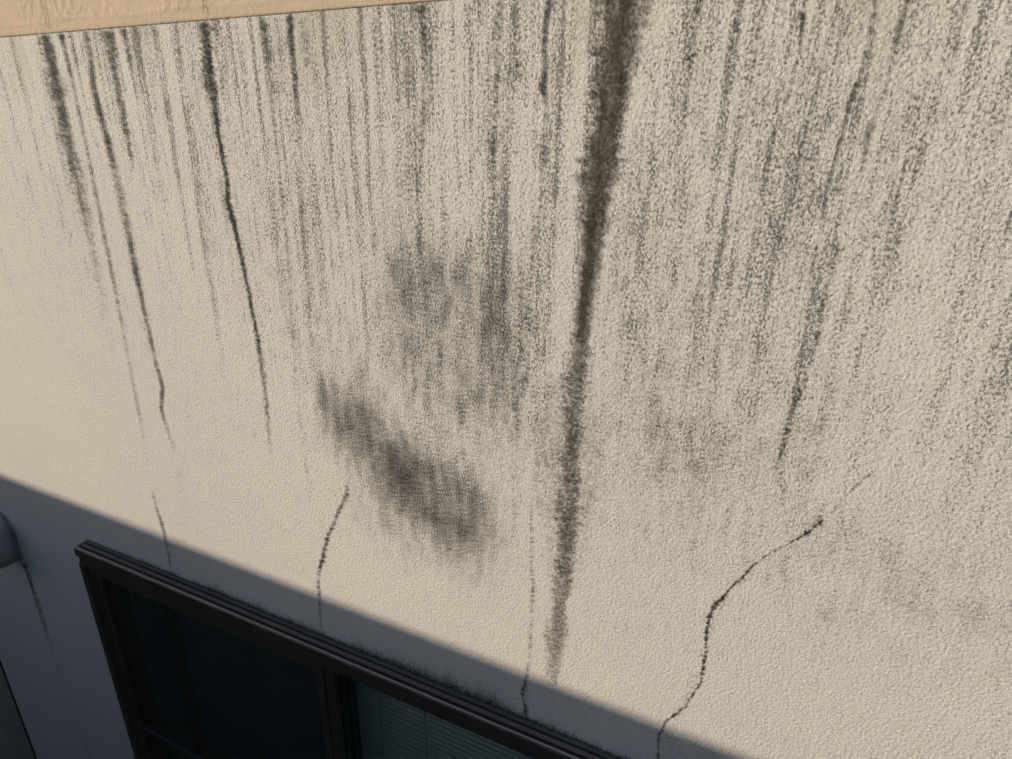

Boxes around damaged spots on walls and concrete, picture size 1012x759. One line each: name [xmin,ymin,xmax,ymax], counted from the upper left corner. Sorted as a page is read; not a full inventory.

damp [37,33,122,325]
damp [84,29,168,434]
damp [199,22,269,418]
damp [259,18,274,125]
damp [285,14,298,122]
damp [538,0,551,166]
damp [820,46,867,219]
damp [386,247,519,416]
damp [551,0,648,668]
crack [317,486,347,622]
damp [315,378,493,560]
crack [657,509,821,759]